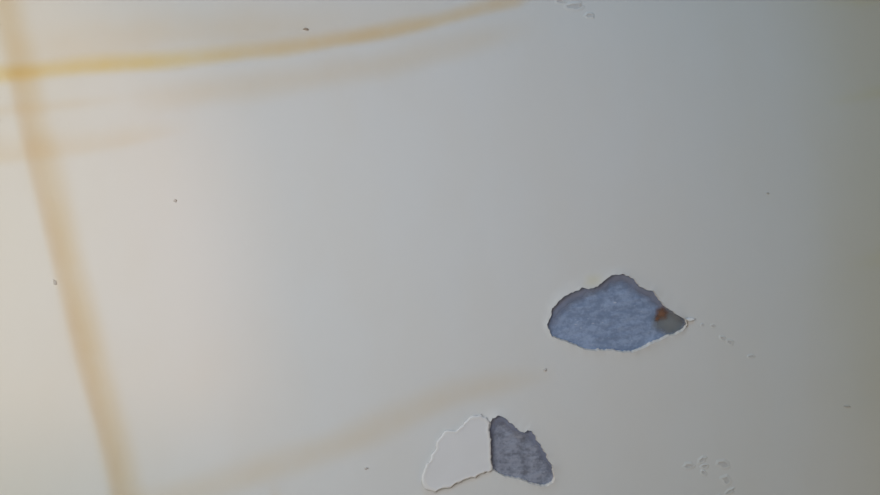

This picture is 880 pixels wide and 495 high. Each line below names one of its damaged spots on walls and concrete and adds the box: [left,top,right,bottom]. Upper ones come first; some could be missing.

peeling [538,262,695,368]
peeling [421,402,568,495]